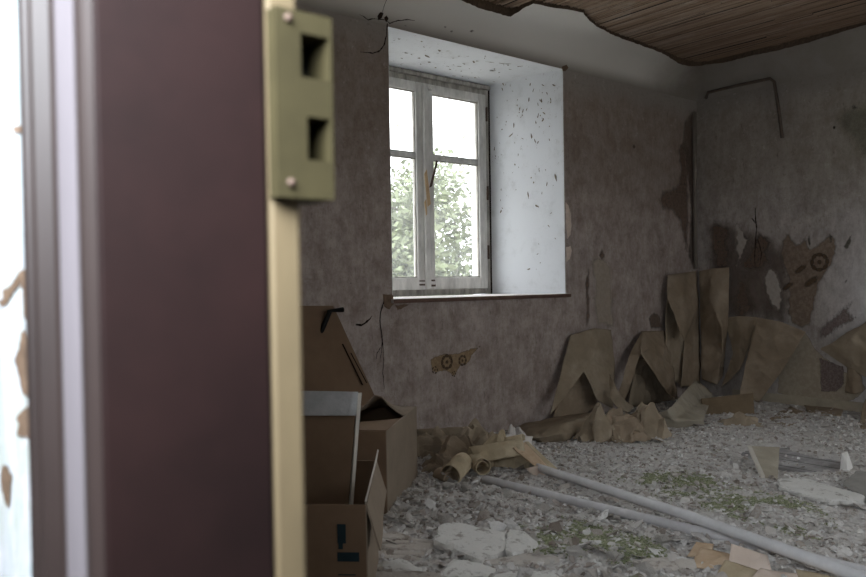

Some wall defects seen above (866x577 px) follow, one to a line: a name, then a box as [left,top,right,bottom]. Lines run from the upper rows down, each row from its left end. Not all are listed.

spalling [462,0,866,66]
peeling [661,145,688,244]
peeling [711,224,851,327]
peeling [0,269,27,396]
peeling [431,346,480,377]
peeling [15,407,28,439]
peeling [0,465,12,508]